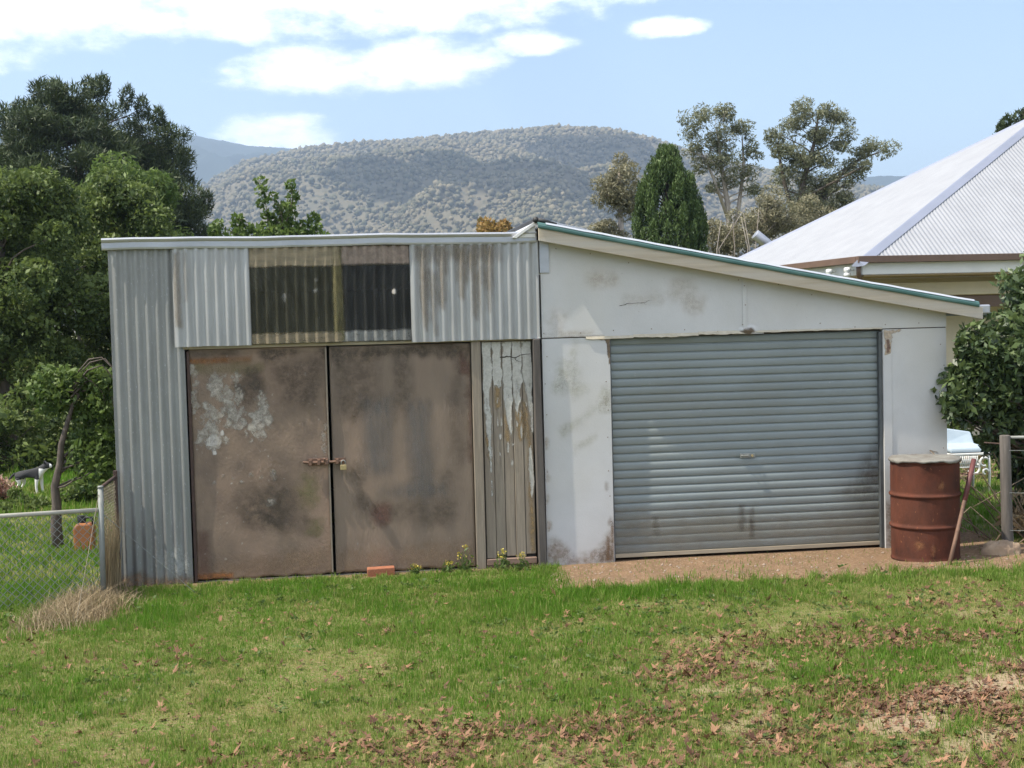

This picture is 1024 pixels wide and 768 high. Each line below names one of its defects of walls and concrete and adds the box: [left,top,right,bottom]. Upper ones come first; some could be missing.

peeling [190,364,272,455]
peeling [482,341,534,550]